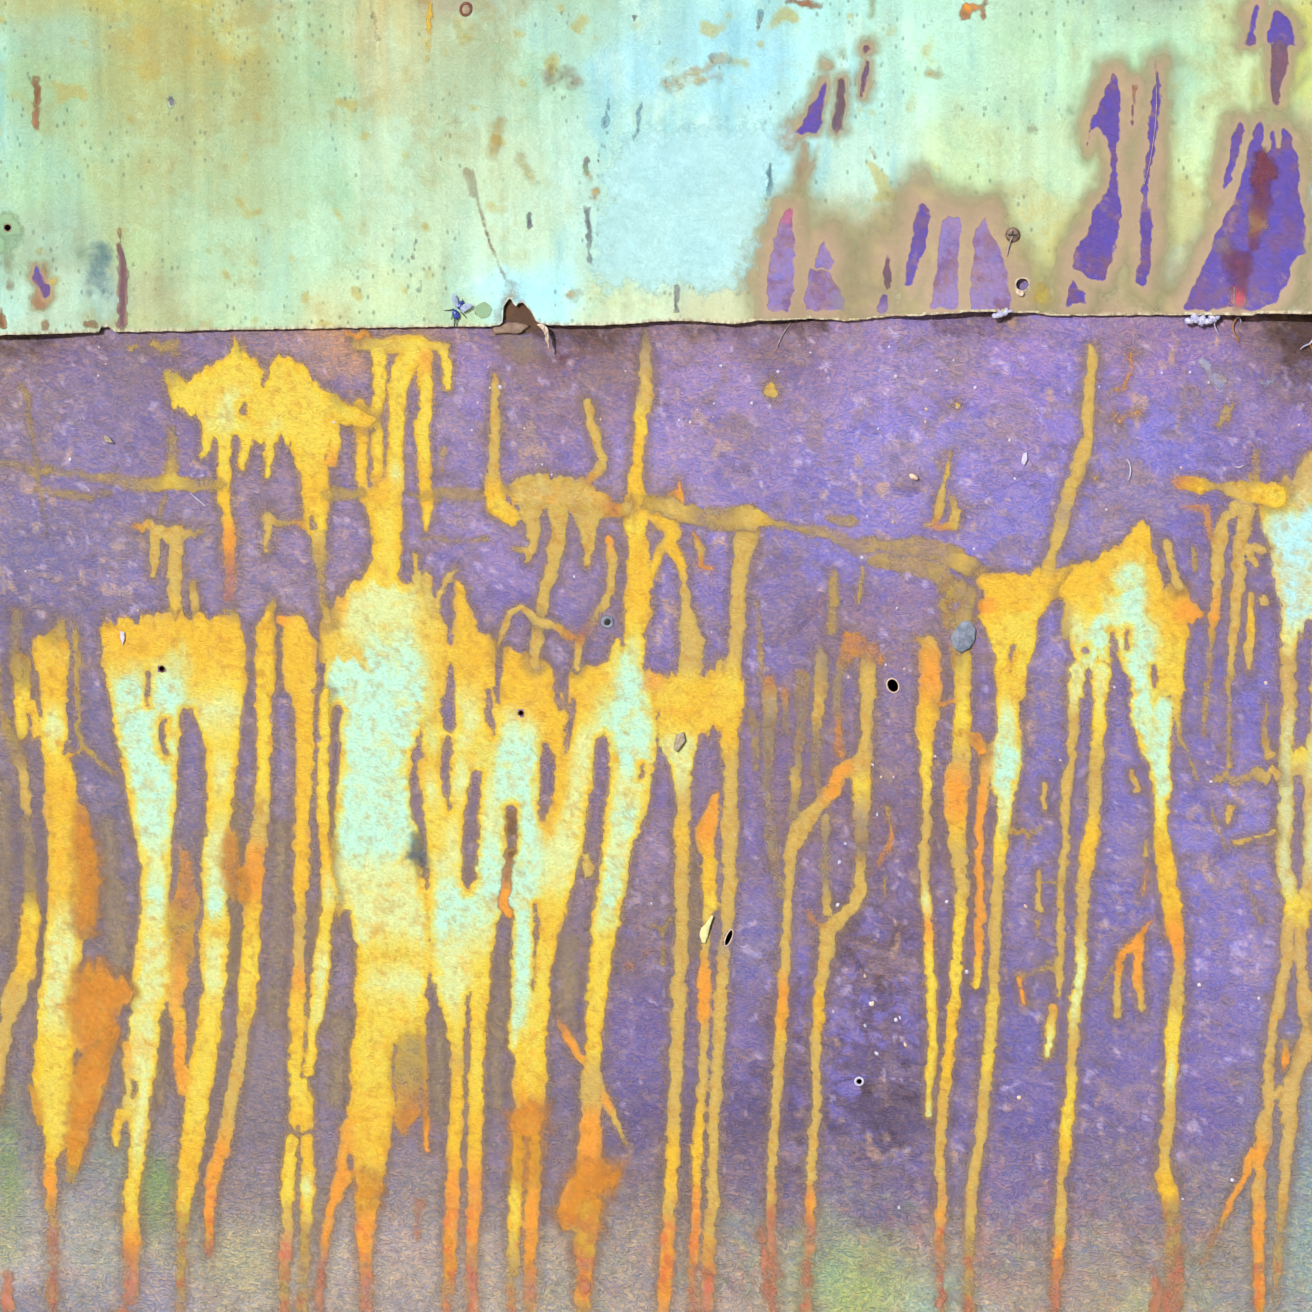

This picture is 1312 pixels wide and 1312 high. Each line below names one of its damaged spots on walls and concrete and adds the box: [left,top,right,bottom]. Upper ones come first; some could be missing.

rust [786,0,819,9]
rust [959,0,987,20]
peeling [743,0,1312,320]
rust [498,811,517,919]